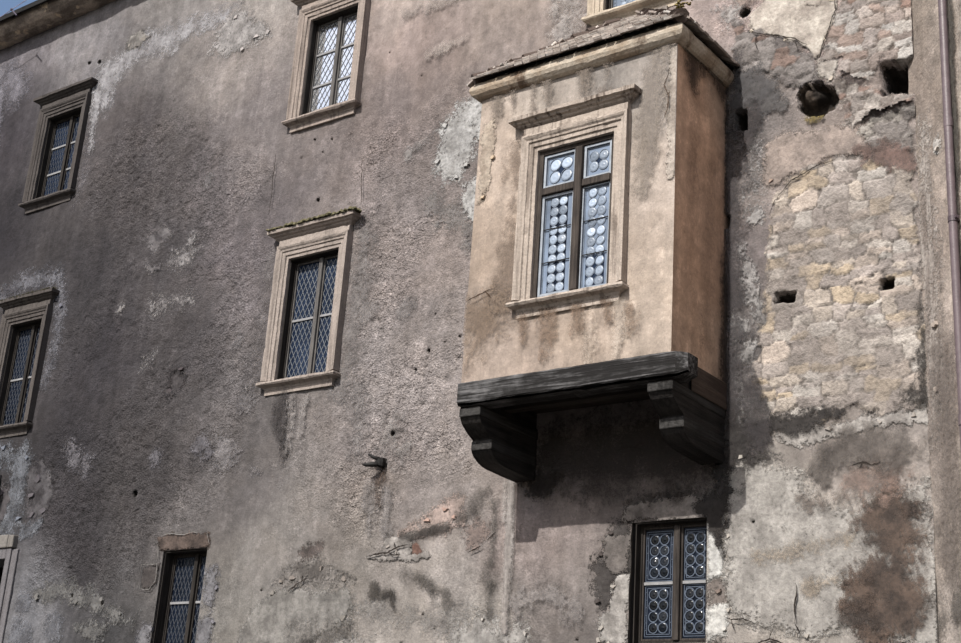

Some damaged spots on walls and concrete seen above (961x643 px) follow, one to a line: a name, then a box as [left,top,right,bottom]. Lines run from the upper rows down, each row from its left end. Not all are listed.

damp [88,3,242,155]
flaking render [431,97,497,222]
damp [710,0,751,31]
flaking render [730,0,953,463]
damp [947,0,961,271]
damp [691,50,961,643]
flaking render [0,439,56,541]
damp [270,389,309,466]
spalling [366,493,491,564]
flaking render [587,484,707,643]
flaking render [706,455,938,643]